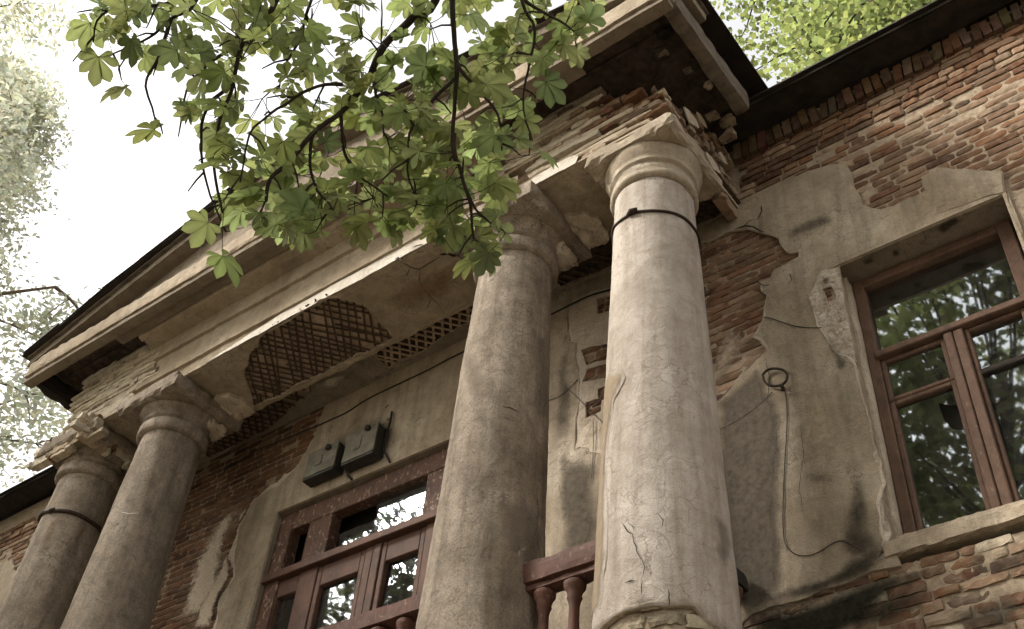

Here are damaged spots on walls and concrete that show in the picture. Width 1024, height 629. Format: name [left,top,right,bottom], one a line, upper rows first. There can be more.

peeling [525,155,578,184]
flaking render [556,15,1024,402]
flaking render [0,515,38,570]
spalling [27,411,138,472]
spalling [150,237,473,629]
crack [622,523,645,594]
spalling [566,287,722,629]
leakage [721,373,879,602]